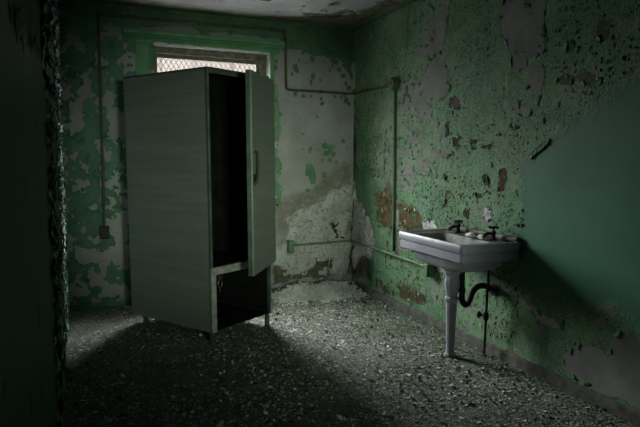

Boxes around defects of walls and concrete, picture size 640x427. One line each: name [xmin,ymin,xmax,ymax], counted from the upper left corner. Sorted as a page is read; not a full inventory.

peeling [537,0,640,105]
peeling [40,0,550,427]
water stain [273,257,330,285]